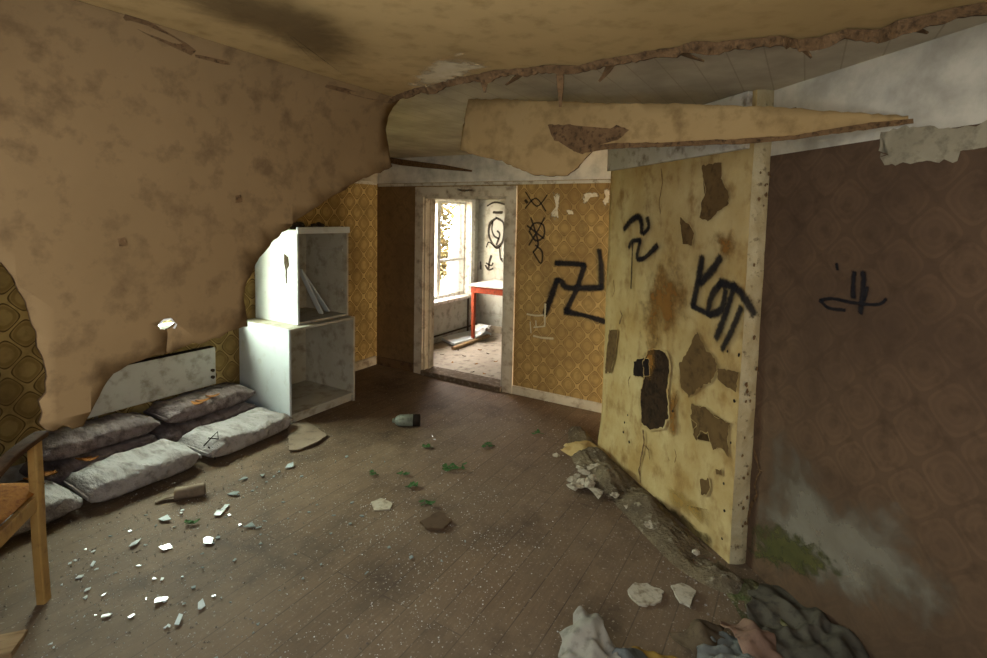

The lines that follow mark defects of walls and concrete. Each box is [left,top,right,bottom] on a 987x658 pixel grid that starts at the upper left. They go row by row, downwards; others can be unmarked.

spalling [579,119,914,153]
peeling [679,162,729,247]
peeling [605,329,618,374]
flaking render [633,332,751,458]
peeling [699,468,725,496]
water stain [769,471,930,603]